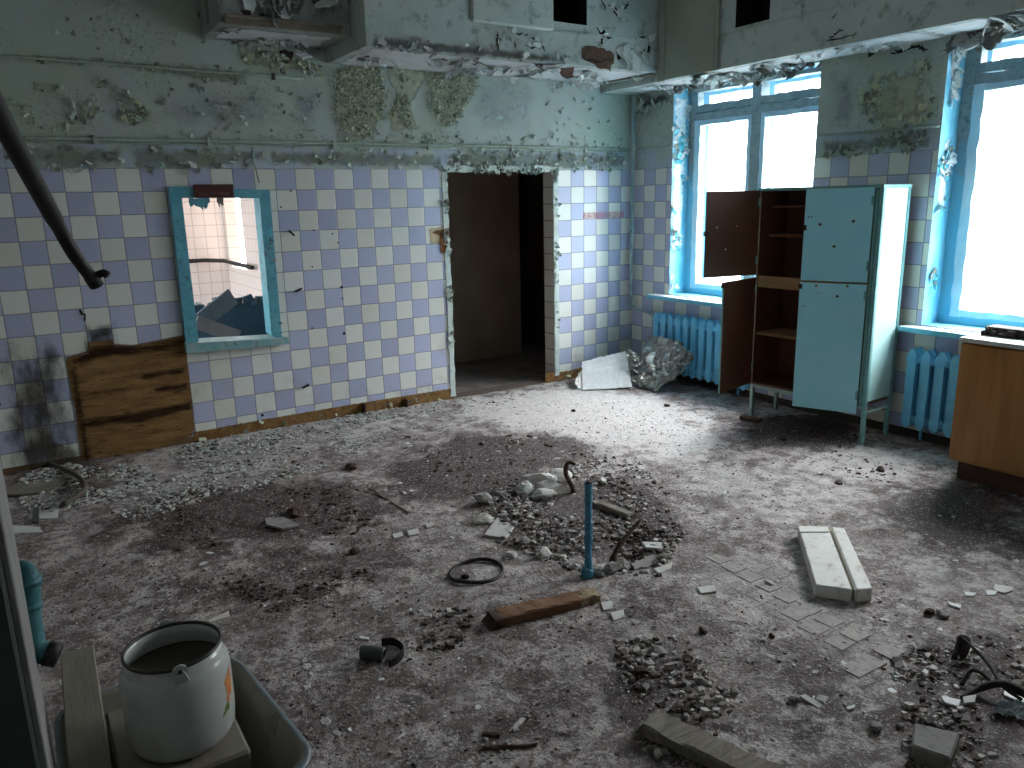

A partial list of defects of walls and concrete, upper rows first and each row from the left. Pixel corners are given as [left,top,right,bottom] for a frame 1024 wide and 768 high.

peeling [7,0,1024,251]
mould [13,351,75,466]
peeling [66,335,454,461]